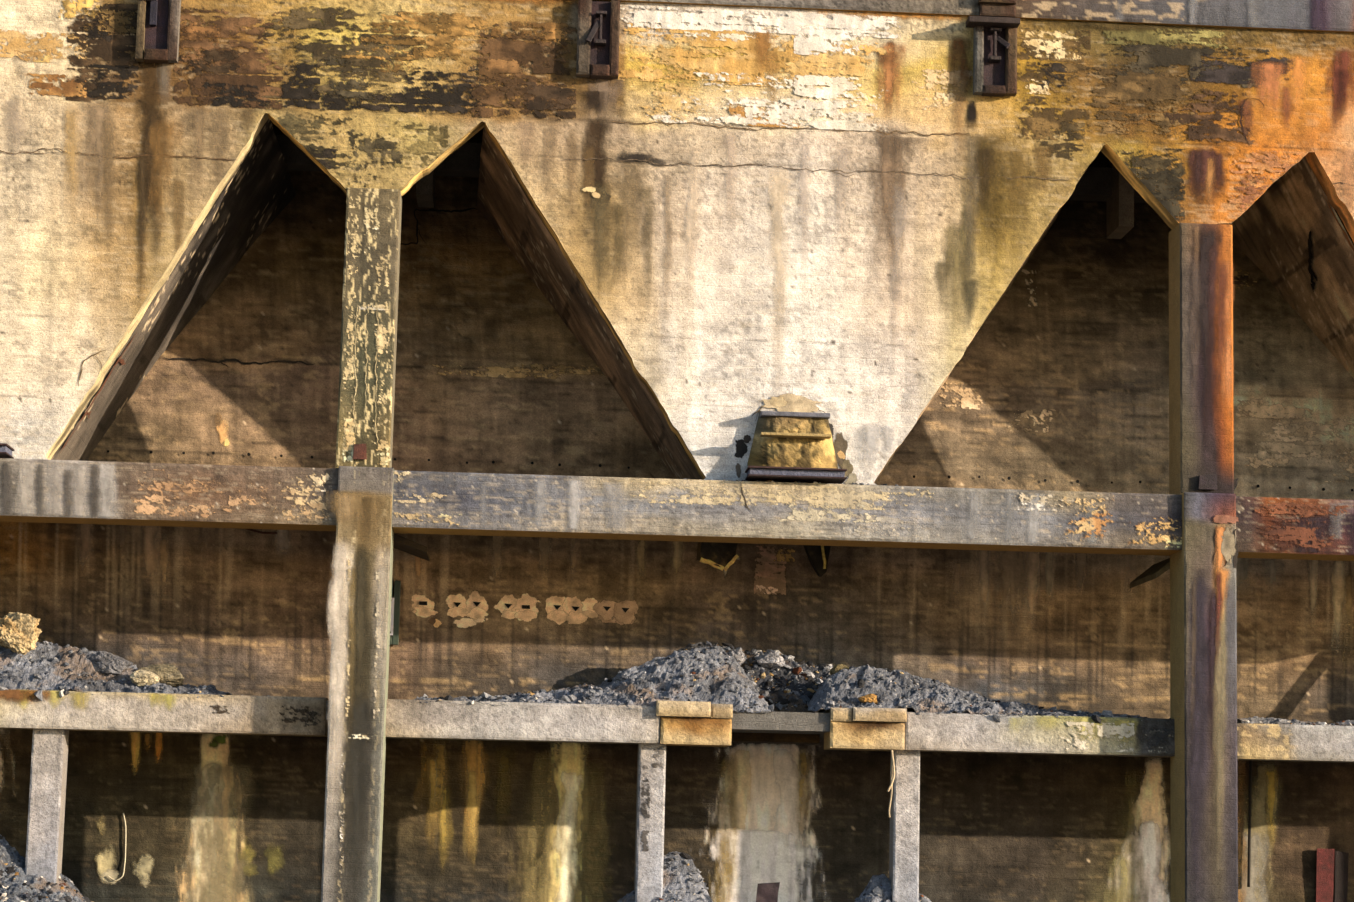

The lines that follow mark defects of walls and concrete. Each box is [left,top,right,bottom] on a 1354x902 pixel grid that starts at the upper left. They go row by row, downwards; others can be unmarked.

peeling [0,0,142,102]
peeling [618,5,901,131]
corrosion [1328,50,1353,118]
leakage [138,62,184,272]
peeling [174,1,577,462]
leakage [876,131,912,297]
crack [1308,182,1354,292]
corrosion [1192,229,1232,393]
peeling [131,469,330,521]
corrosion [1255,502,1350,552]
leakage [467,744,481,832]
leakage [524,742,604,902]